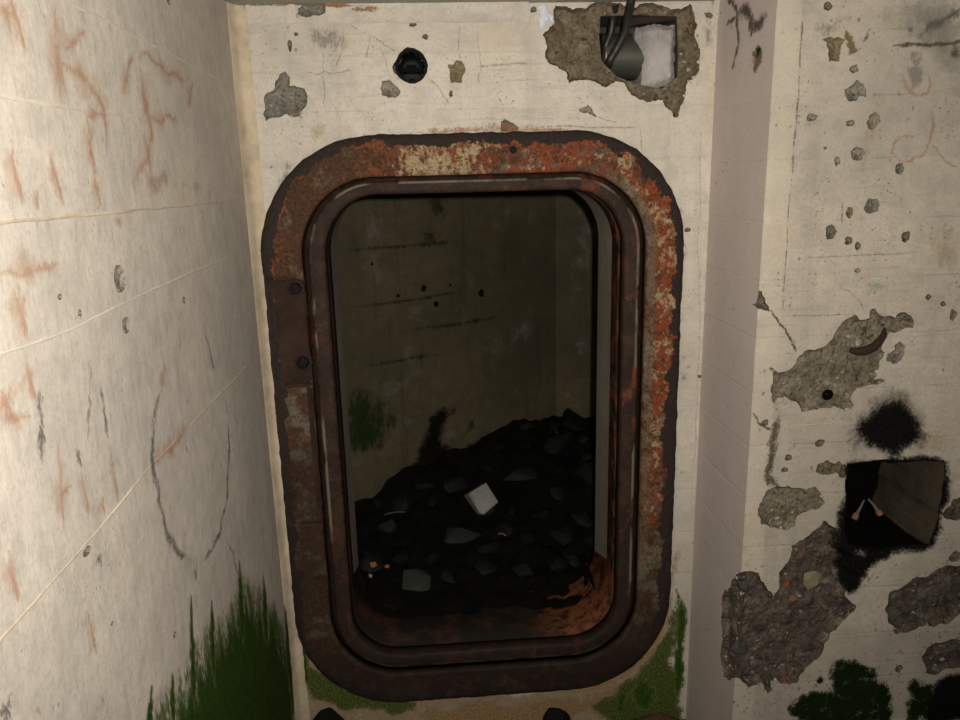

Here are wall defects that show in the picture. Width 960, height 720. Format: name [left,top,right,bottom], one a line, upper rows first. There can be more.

spalling [263,72,308,121]
spalling [543,2,713,118]
crack [771,23,803,352]
spalling [769,309,914,412]
damp [150,431,185,558]
damp [189,597,197,712]
damp [229,545,245,644]
damp [284,606,294,697]
rust [564,595,673,692]
damp [673,588,687,702]
spalling [720,521,856,694]
spalling [885,550,960,634]